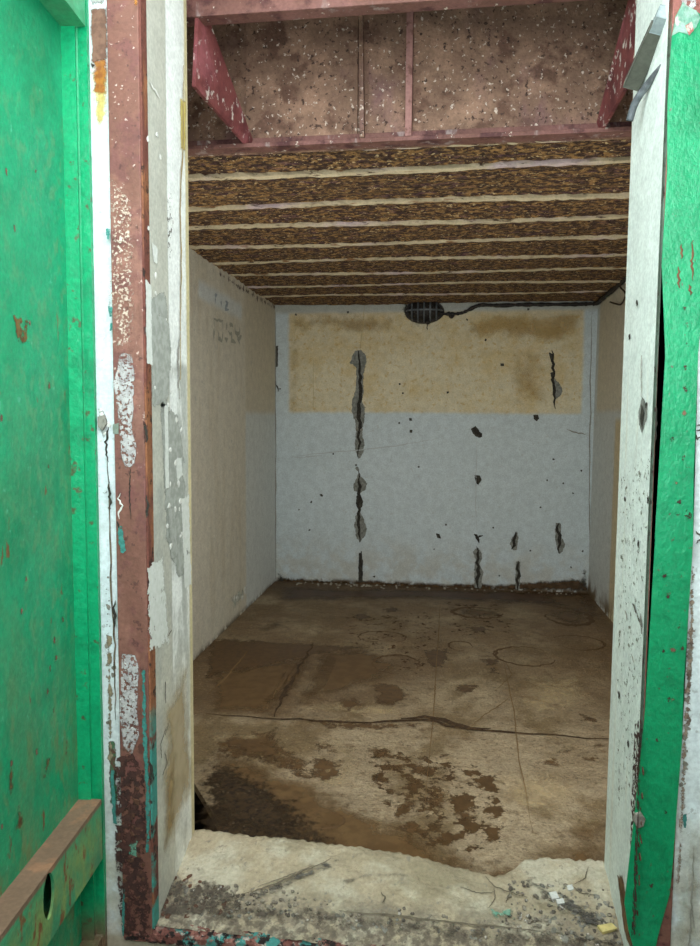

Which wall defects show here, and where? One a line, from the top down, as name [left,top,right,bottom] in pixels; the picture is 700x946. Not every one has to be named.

rust [13,315,31,343]
peeling [145,193,192,651]
peeling [97,185,139,804]
spalling [510,532,519,550]
rust [110,670,153,938]
rust [166,692,190,830]
leakage [217,727,511,862]